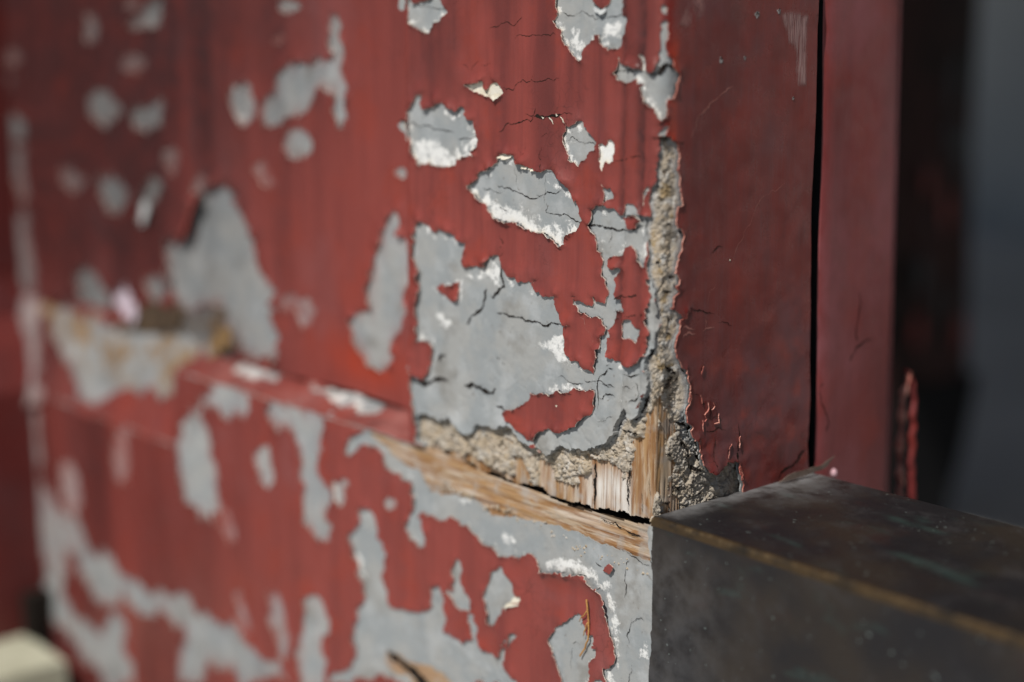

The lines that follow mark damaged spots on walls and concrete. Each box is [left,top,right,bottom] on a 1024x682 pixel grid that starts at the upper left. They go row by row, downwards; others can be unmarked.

peeling [11,0,739,682]
crack [593,441,650,538]